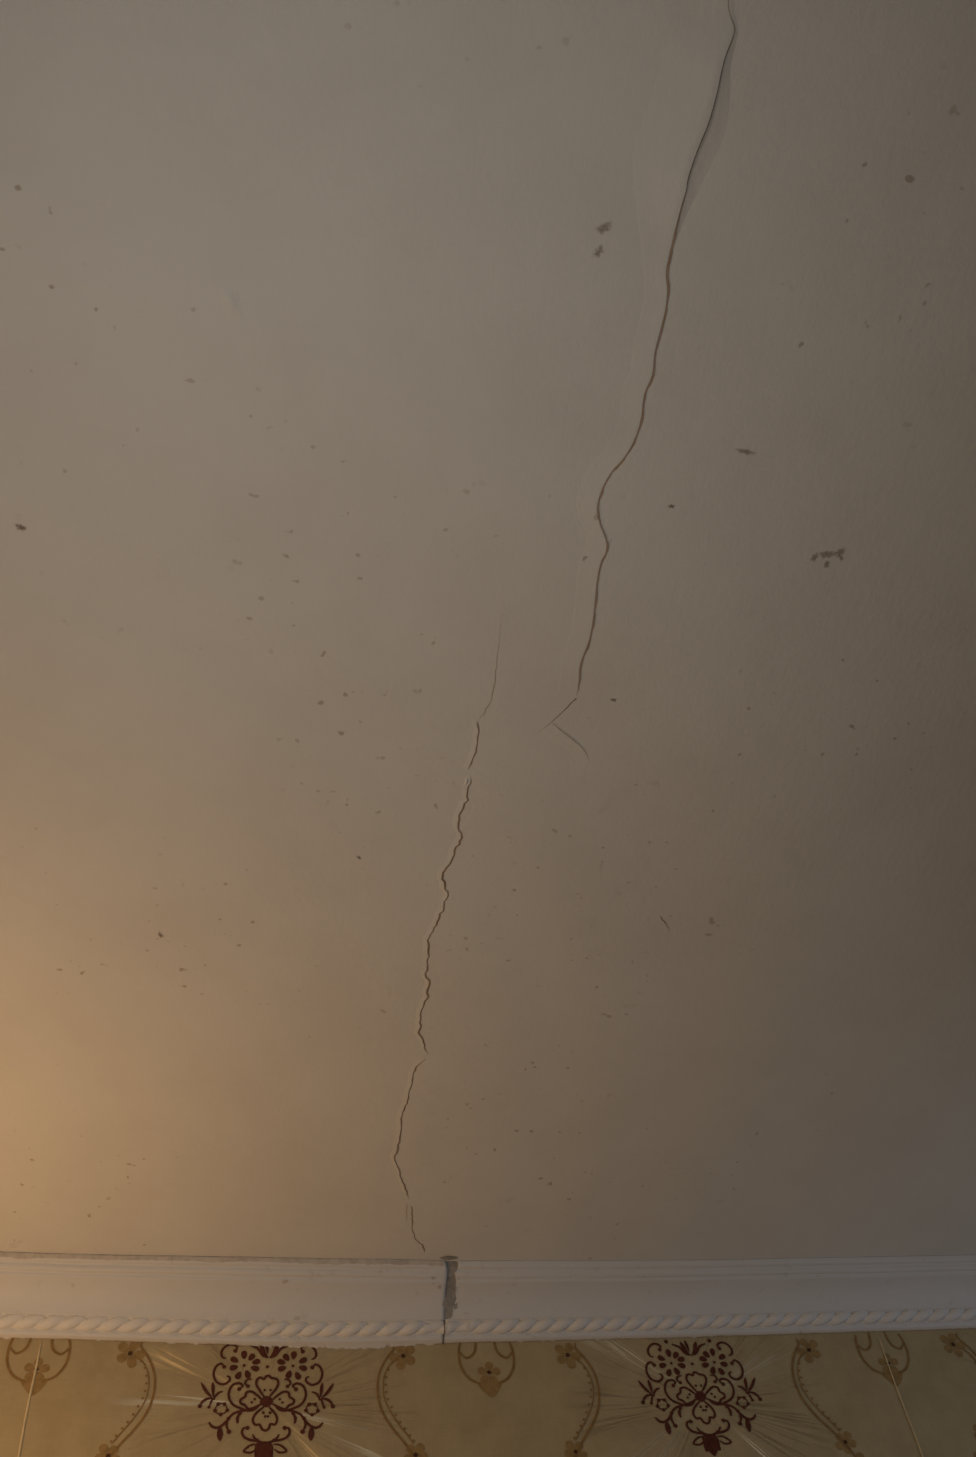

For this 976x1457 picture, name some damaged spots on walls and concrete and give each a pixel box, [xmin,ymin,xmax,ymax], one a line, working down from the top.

crack [390,626,501,1344]